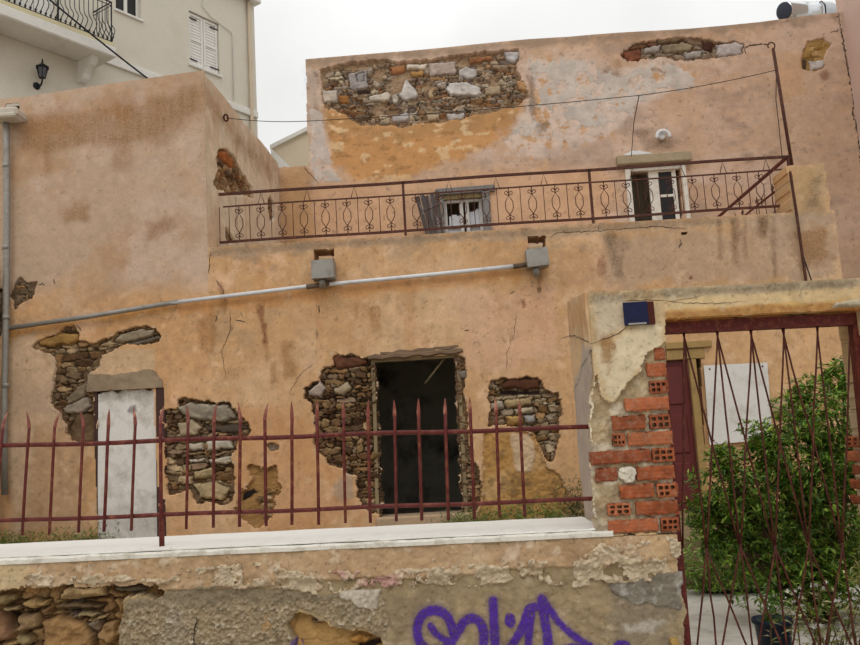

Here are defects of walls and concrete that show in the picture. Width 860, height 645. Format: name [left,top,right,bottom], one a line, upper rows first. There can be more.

spalling [309,38,744,183]
crack [833,13,860,158]
spalling [213,148,254,198]
spalling [0,277,55,336]
crack [208,252,231,375]
spalling [33,324,161,442]
flaking render [0,343,683,645]